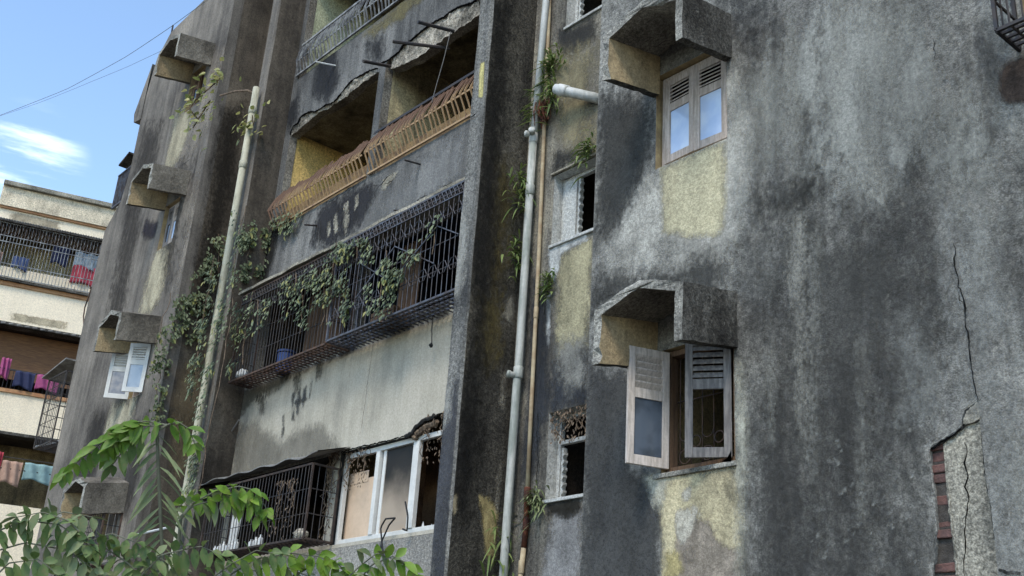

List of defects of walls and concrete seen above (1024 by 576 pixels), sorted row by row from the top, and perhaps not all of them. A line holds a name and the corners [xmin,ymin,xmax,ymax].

spalling [290,0,480,139]
damp [552,0,1022,319]
damp [230,0,515,576]
damp [789,217,807,410]
crack [952,241,978,400]
spalling [928,396,1021,576]